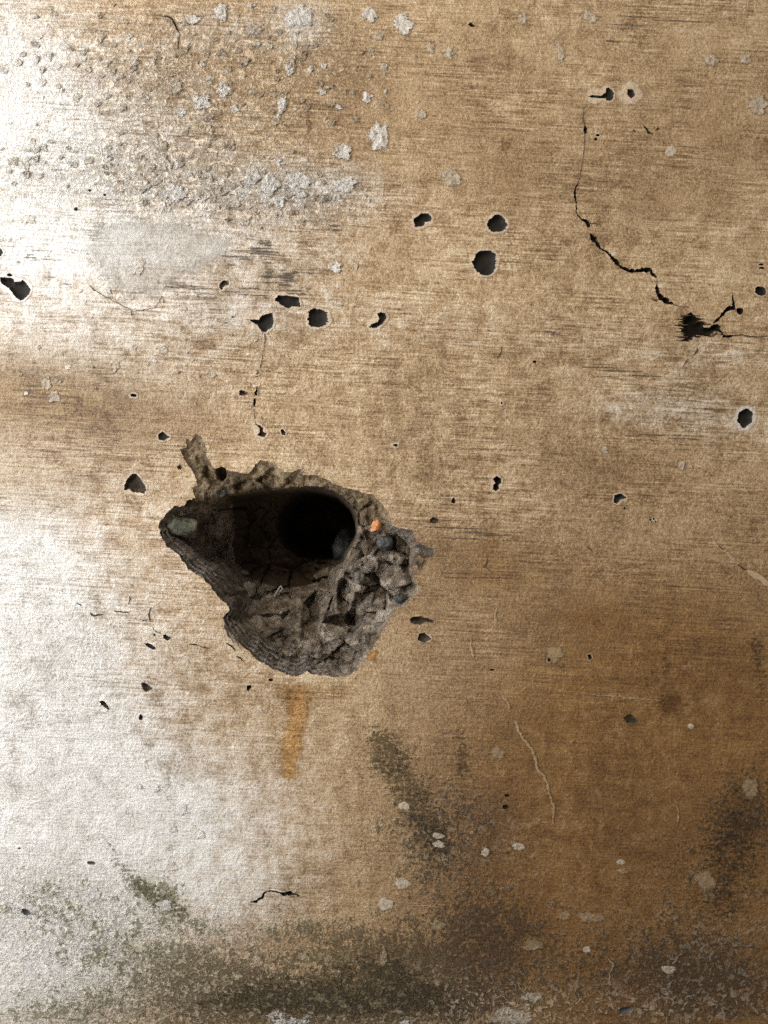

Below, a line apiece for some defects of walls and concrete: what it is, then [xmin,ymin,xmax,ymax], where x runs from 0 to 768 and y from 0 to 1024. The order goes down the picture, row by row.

peeling [0,34,82,102]
peeling [63,12,360,138]
peeling [0,105,340,229]
crack [574,106,765,369]
peeling [156,430,172,442]
spalling [158,434,434,681]
corrosion [274,680,358,780]
water stain [155,900,173,911]
crack [250,889,299,903]